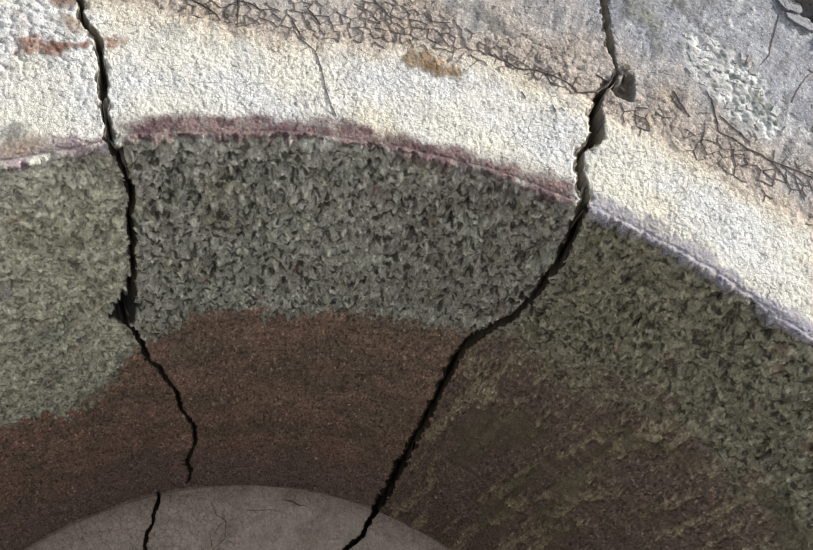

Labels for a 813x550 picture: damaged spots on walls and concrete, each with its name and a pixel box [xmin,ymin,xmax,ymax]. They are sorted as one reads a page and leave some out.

rust [14,35,90,56]
crack [75,0,306,550]
crack [170,0,813,550]
spalling [776,0,813,32]